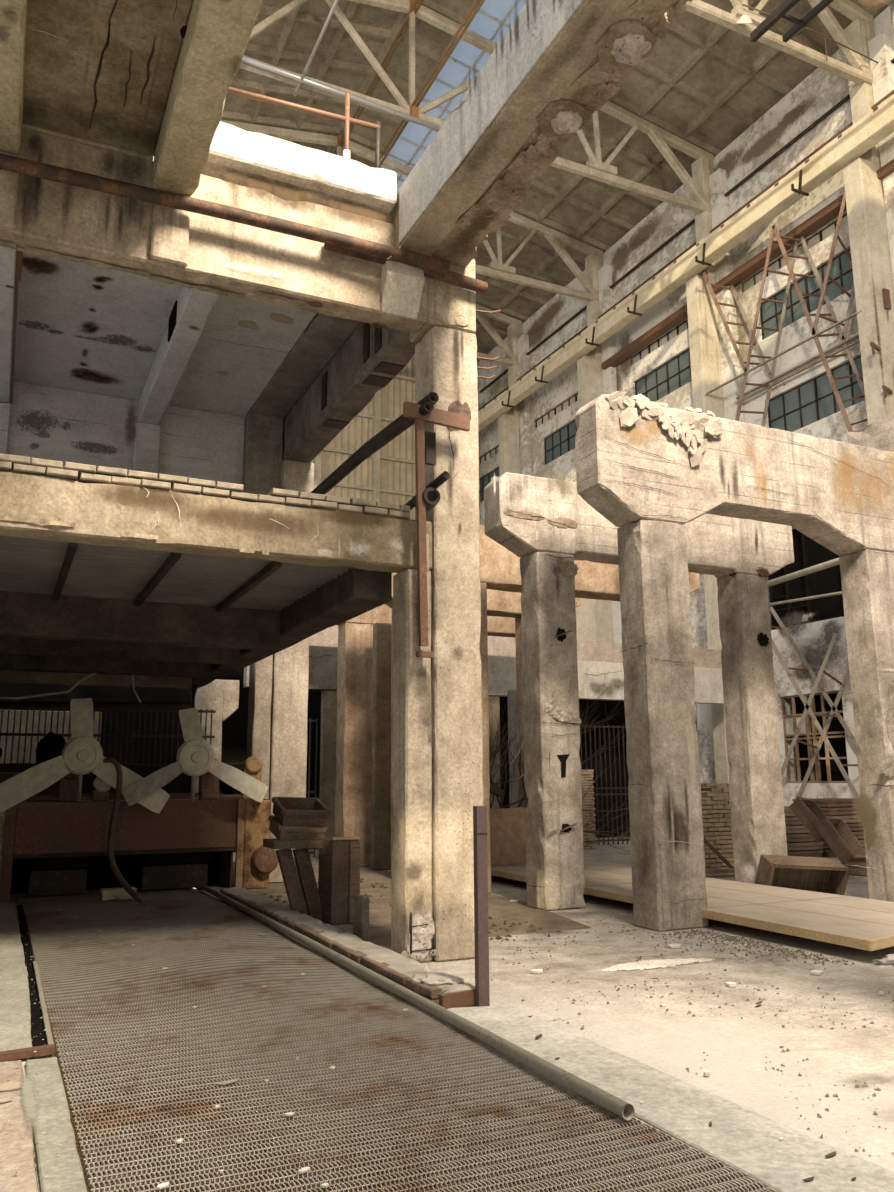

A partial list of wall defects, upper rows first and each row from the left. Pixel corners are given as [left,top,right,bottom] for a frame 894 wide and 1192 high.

crack [89,0,177,129]
spalling [460,0,693,238]
peeling [611,217,660,290]
peeling [605,336,723,467]